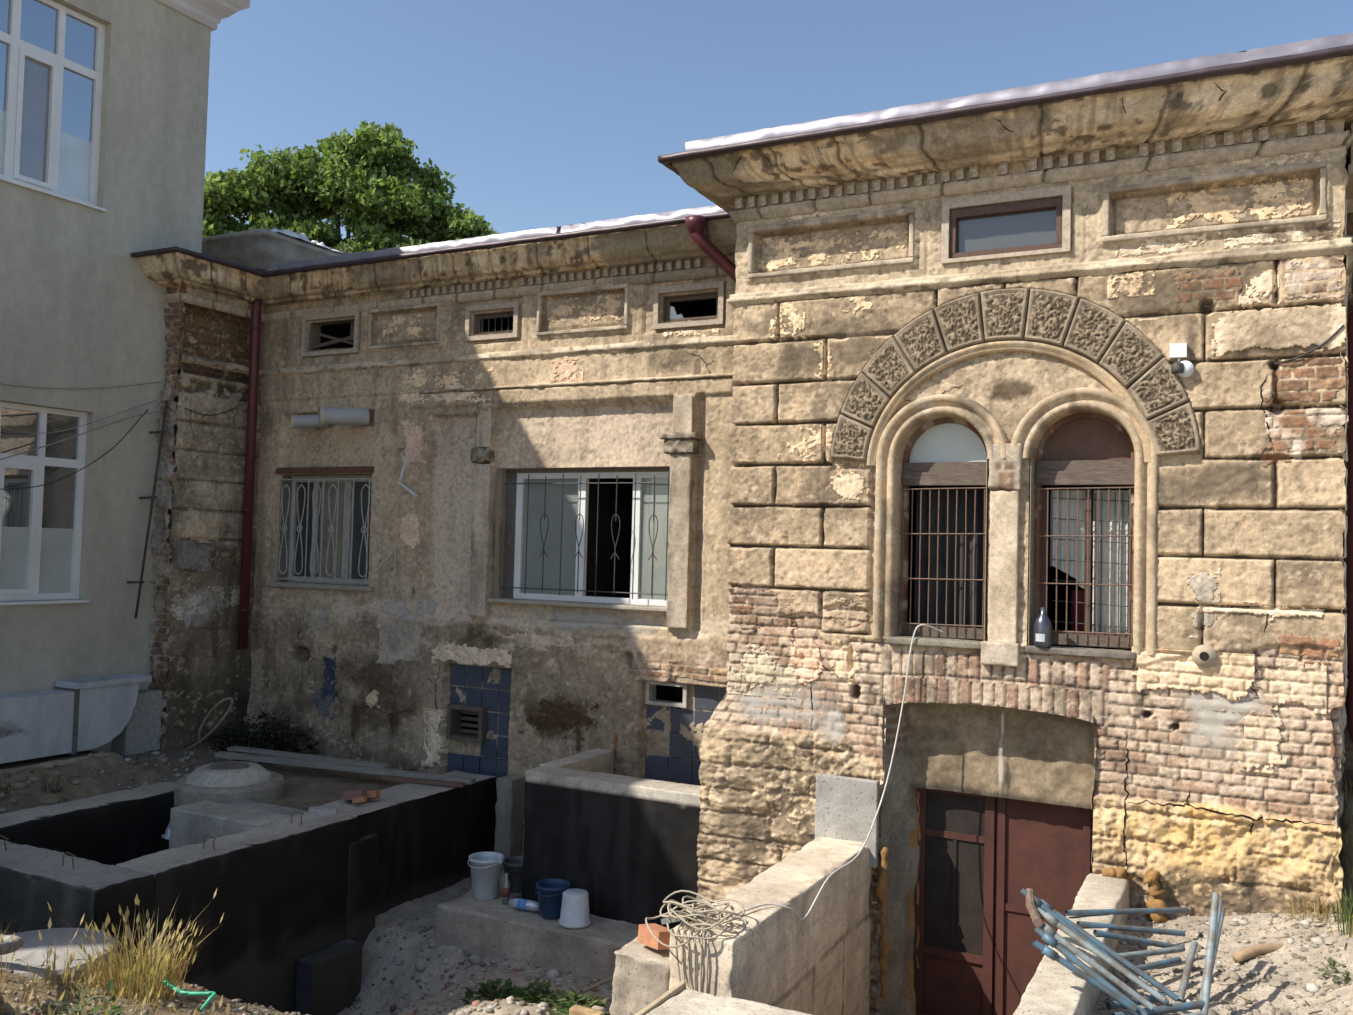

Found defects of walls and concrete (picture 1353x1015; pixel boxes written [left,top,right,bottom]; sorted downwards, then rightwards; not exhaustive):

peeling [758,210,909,272]
peeling [1107,149,1341,299]
flaking render [1174,256,1349,313]
flaking render [1260,352,1349,467]
spalling [148,286,240,750]
flaking render [730,586,797,658]
flaking render [811,591,873,643]
flaking render [629,660,762,697]
crack [1123,732,1335,871]